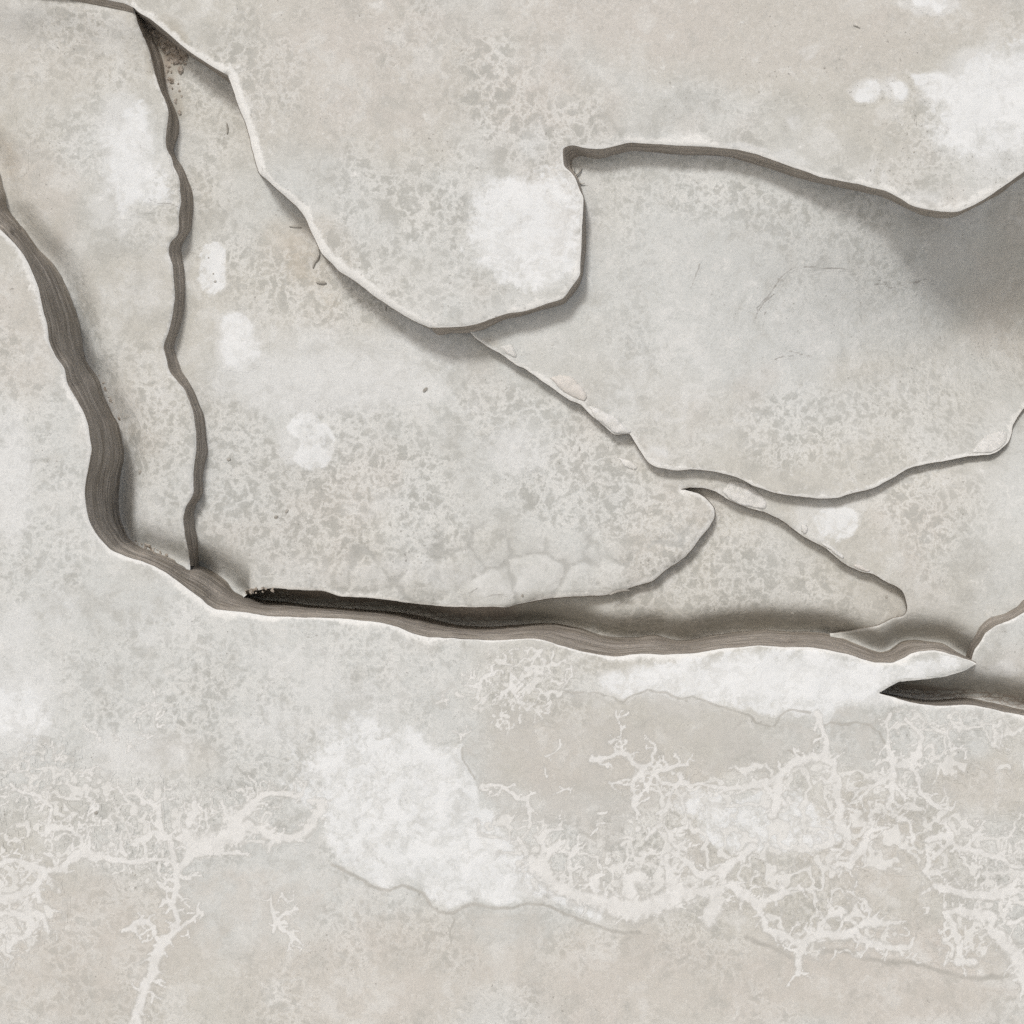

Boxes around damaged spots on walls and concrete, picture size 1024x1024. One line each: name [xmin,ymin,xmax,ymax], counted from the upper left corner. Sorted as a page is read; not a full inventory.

flaking render [0,0,1024,709]
crack [0,0,1024,716]
water stain [0,640,1024,1024]